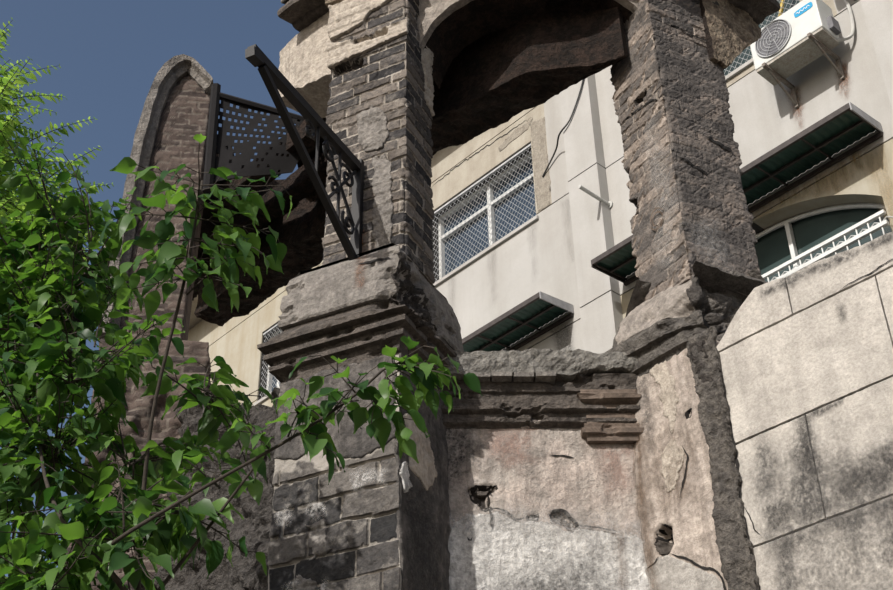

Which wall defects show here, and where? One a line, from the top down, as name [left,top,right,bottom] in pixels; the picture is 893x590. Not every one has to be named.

flaking render [399,413,437,493]
flaking render [448,313,760,590]
leakage [767,419,831,531]
crack [647,553,726,590]